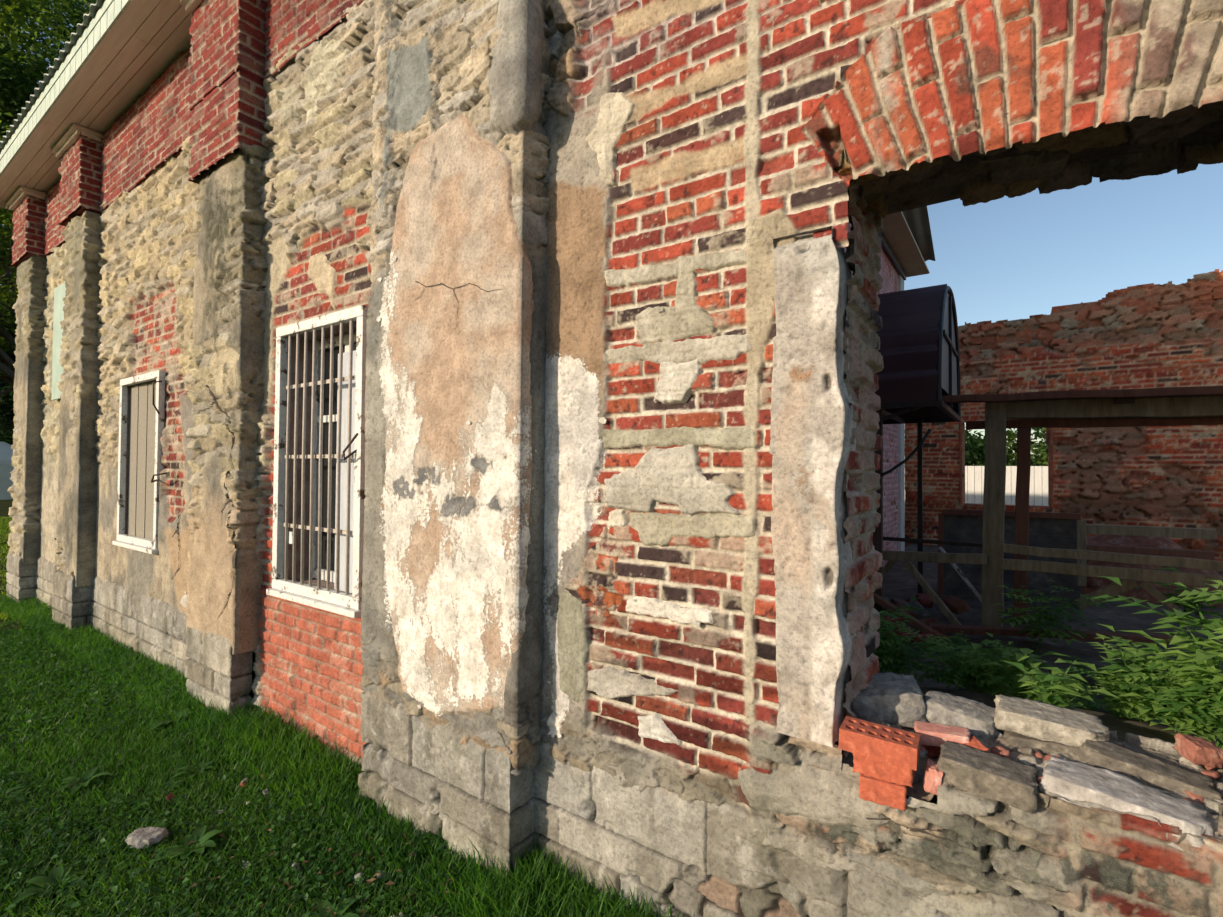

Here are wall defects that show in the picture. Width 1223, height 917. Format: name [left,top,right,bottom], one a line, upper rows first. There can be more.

crack [414,281,500,313]
peeling [376,114,758,738]
crack [199,385,237,618]
crack [172,510,183,579]
peeling [638,712,682,745]